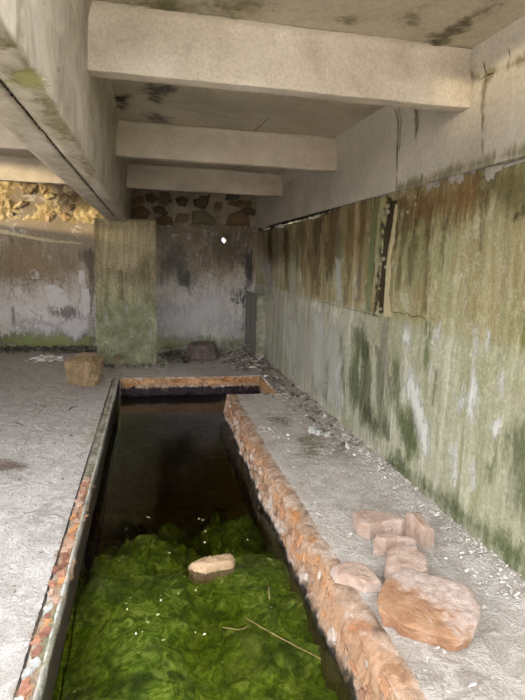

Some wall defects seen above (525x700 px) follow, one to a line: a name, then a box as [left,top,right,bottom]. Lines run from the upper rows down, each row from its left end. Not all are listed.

water stain [432,17,470,46]
mould [145,83,177,103]
peeling [426,159,525,193]
water stain [0,237,108,324]
water stain [353,201,377,313]
spalling [373,189,417,317]
crack [319,301,425,319]
water stain [422,322,439,367]
efflorescence [403,365,430,457]
efflorescence [458,366,478,420]